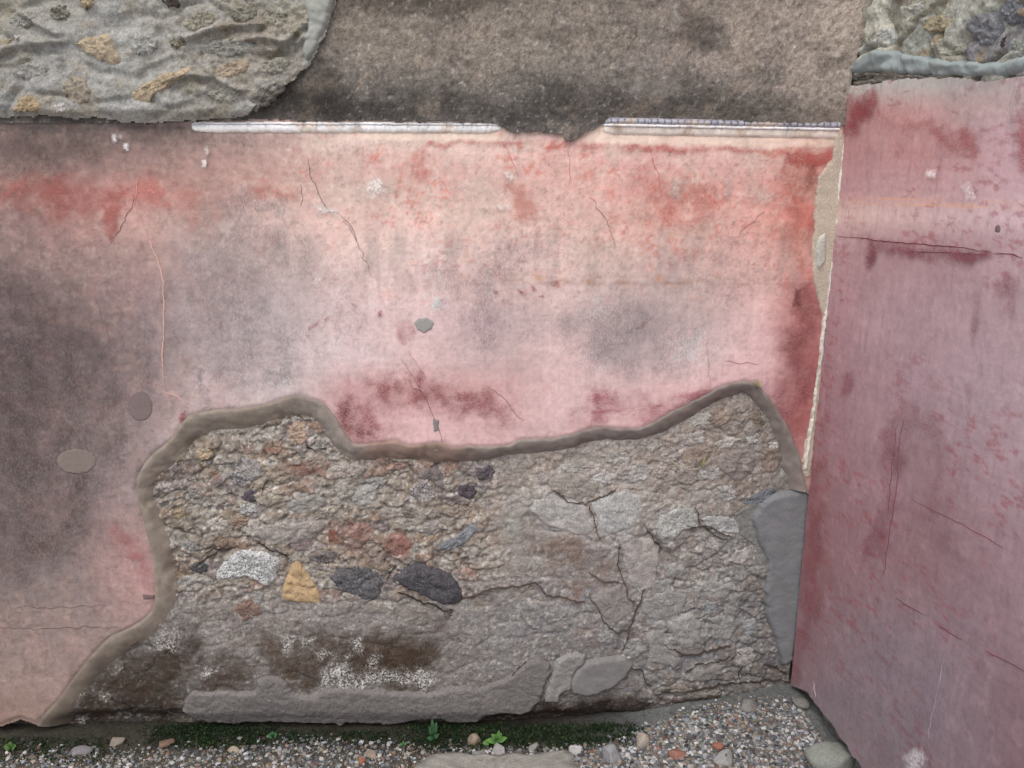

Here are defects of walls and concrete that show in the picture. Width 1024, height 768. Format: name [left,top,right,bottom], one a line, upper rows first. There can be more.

crack [114,176,188,408]
crack [301,163,370,273]
spalling [13,133,844,727]
crack [386,489,790,704]